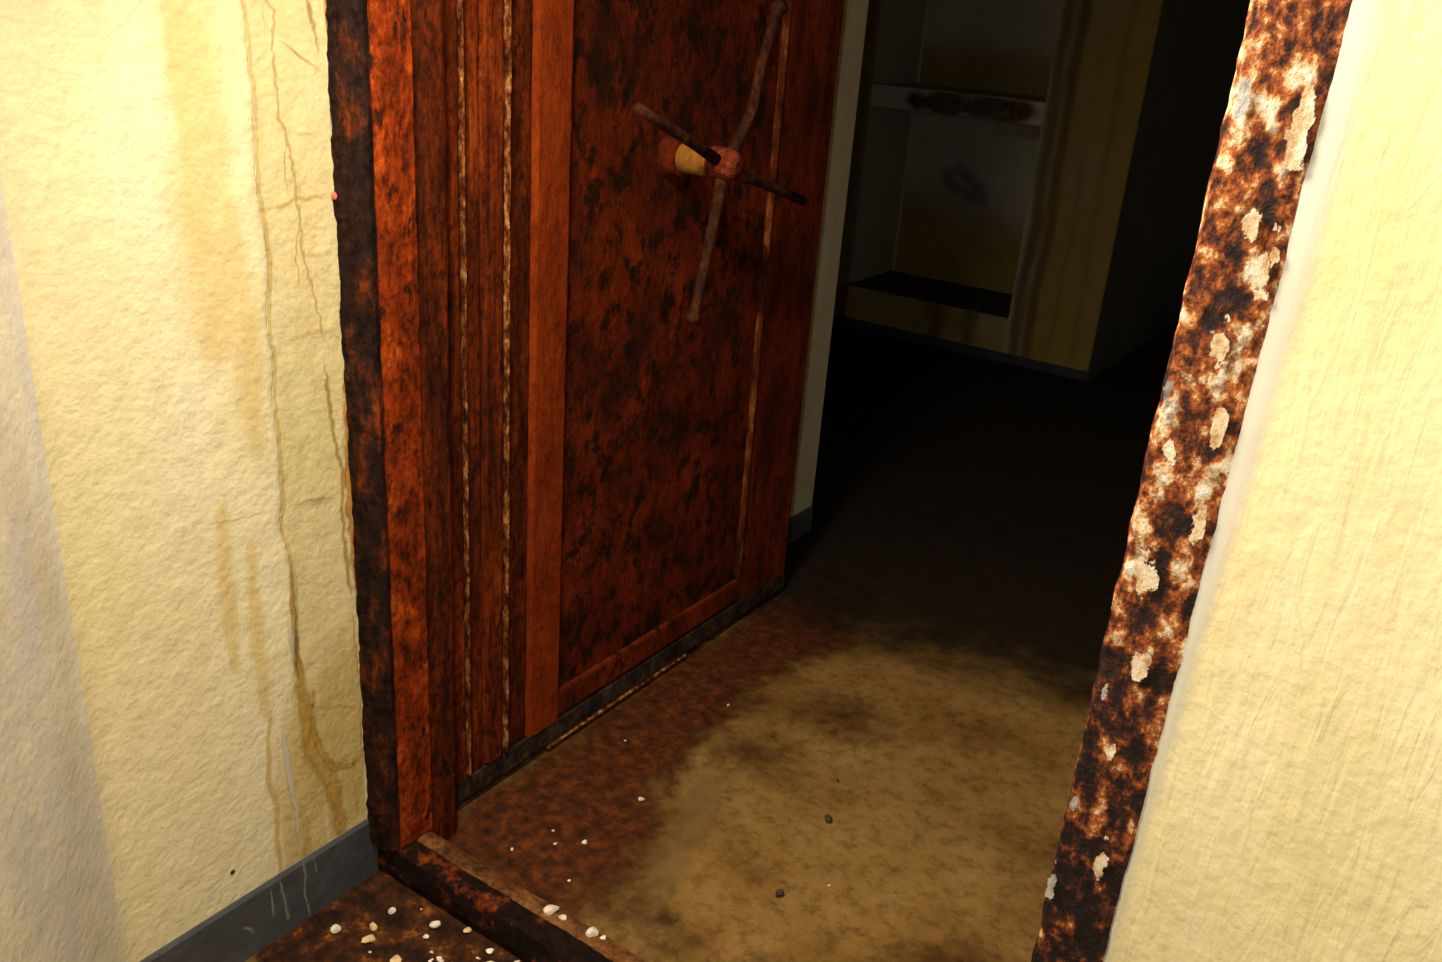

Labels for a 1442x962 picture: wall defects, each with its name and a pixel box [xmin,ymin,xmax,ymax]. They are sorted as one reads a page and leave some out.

water stain [166,0,259,433]
crack [272,3,325,331]
crack [308,375,350,584]
water stain [249,543,365,919]